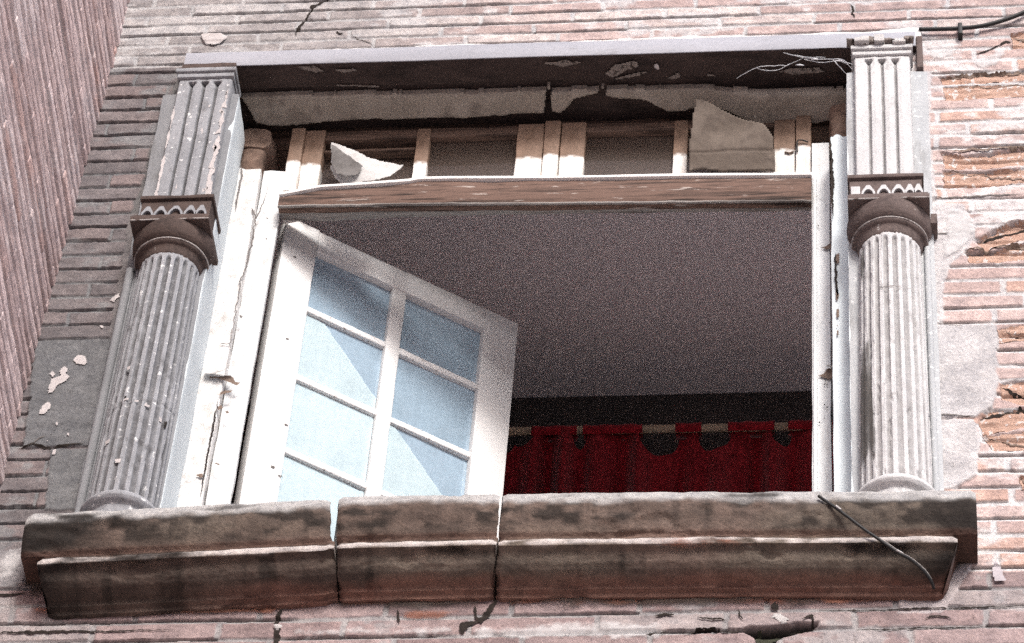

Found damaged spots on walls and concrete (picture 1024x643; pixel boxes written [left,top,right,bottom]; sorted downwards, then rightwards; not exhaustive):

crack [295,0,328,36]
peeling [605,61,647,79]
crack [221,164,268,359]
flaking render [945,209,1024,264]
spalling [997,325,1024,343]
flaking render [39,355,87,414]
spalling [979,382,1024,451]
crack [200,402,218,496]
crack [459,600,497,634]